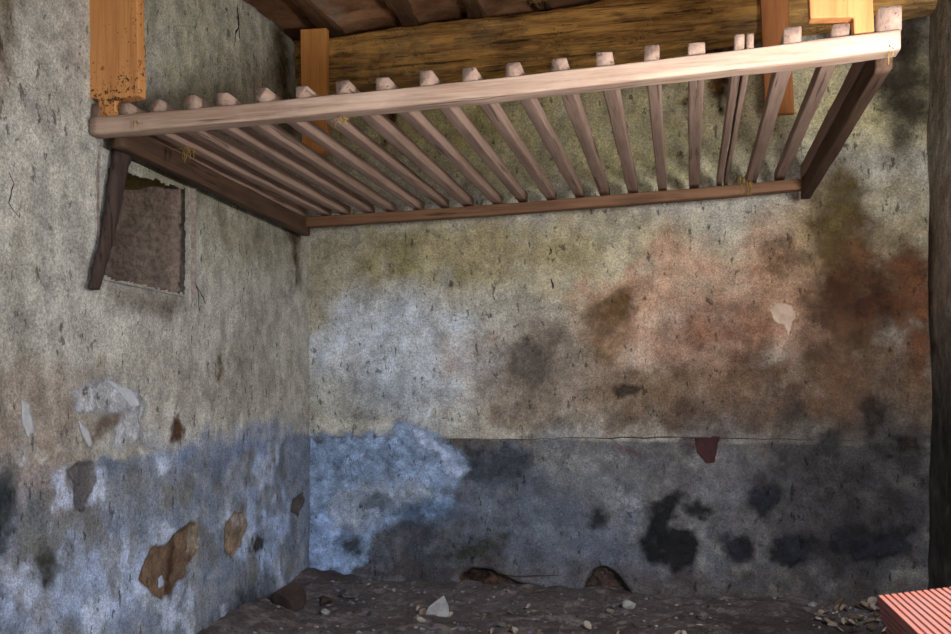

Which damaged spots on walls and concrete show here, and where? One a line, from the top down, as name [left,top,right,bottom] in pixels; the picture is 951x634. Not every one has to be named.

flaking render [770,303,796,337]
flaking render [72,378,156,448]
peeling [1,400,66,470]
damp [465,444,530,481]
flaking render [67,461,97,512]
damp [749,481,780,517]
damp [39,557,60,584]
flaking render [139,522,198,599]
damp [251,534,264,552]
damp [590,485,711,573]
damp [723,536,755,562]
damp [771,536,818,567]